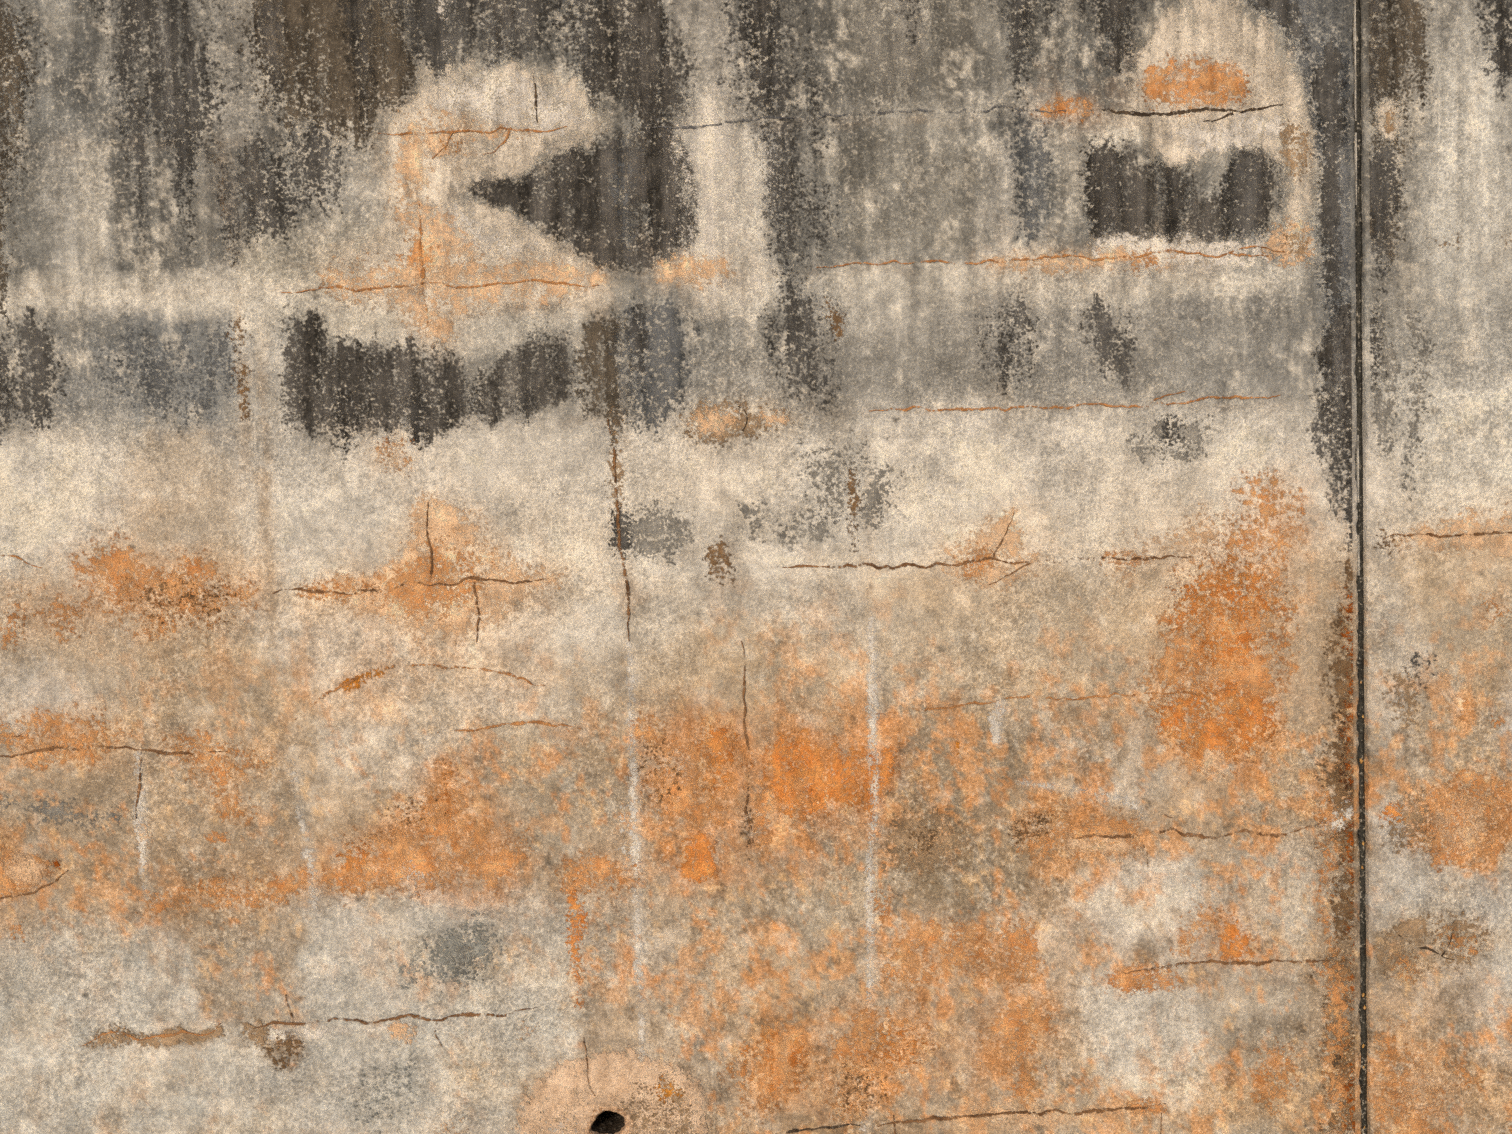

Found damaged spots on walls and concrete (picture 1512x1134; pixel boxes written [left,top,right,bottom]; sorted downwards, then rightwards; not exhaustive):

leakage [90,0,846,586]
leakage [1078,136,1279,243]
leakage [1248,0,1353,550]
leakage [1369,0,1437,501]
crack [272,503,581,736]
rust [296,491,567,646]
crack [607,419,630,641]
rust [1100,470,1305,776]
crack [82,994,537,1047]
rust [630,711,1167,1134]
crack [786,1103,1165,1134]
rust [1310,548,1355,1134]